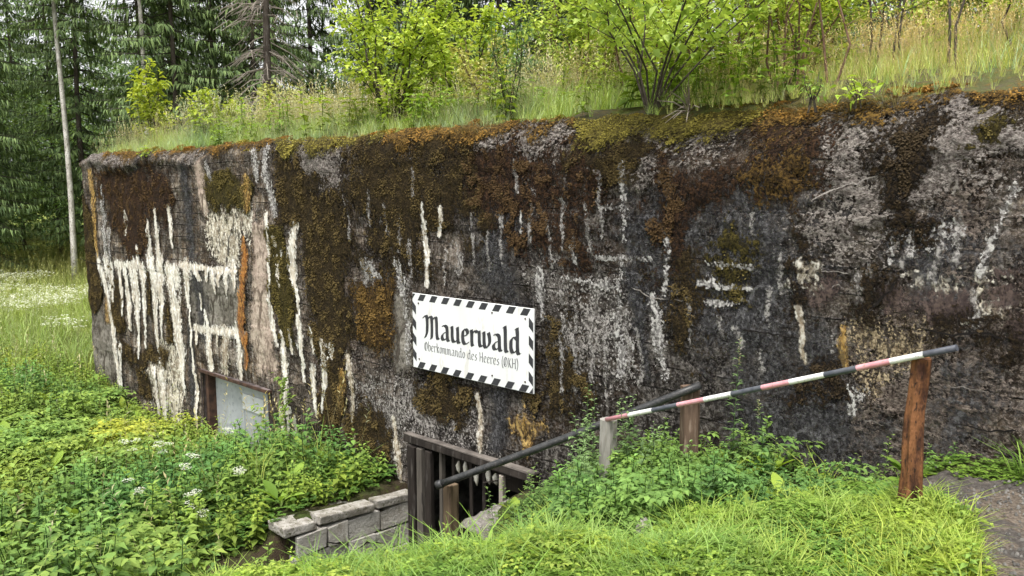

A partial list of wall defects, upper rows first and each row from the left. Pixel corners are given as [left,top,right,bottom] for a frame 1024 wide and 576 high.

water stain [96,161,245,425]
corrosion [236,236,249,369]
efflorescence [249,142,356,440]
efflorescence [421,202,443,288]
water stain [467,191,534,306]
efflorescence [533,266,545,320]
water stain [561,161,674,381]
water stain [683,158,901,483]
water stain [877,181,1021,300]